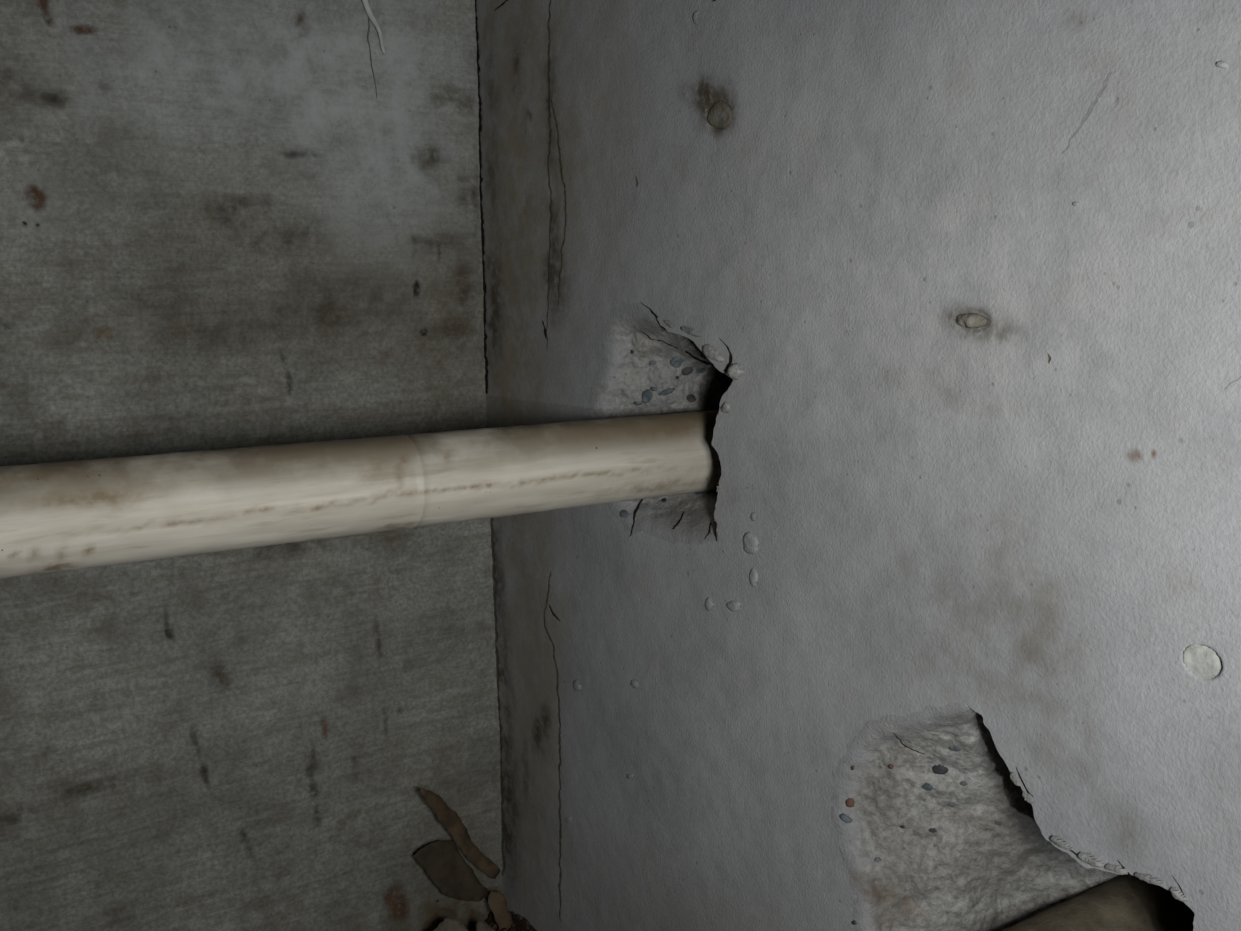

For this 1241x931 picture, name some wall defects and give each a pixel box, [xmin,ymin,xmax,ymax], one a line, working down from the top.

crack [475,0,508,394]
crack [542,0,567,346]
spalling [584,302,744,420]
spalling [607,485,721,545]
crack [544,573,562,922]
spalling [830,700,1187,931]